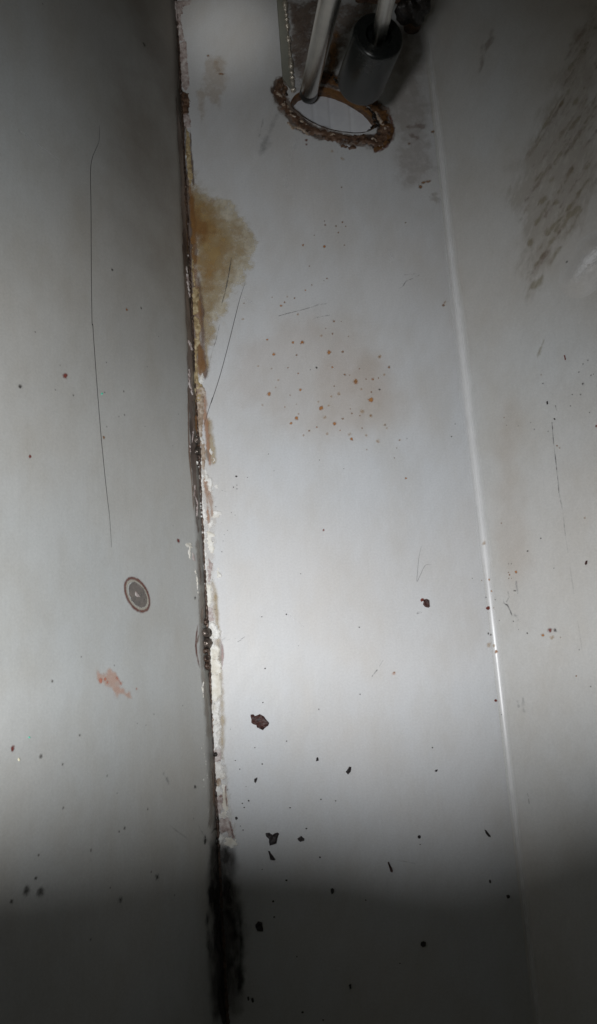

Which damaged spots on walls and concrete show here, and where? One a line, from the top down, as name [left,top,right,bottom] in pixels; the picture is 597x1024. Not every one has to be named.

corrosion [271,0,395,152]
damp [207,845,244,1024]